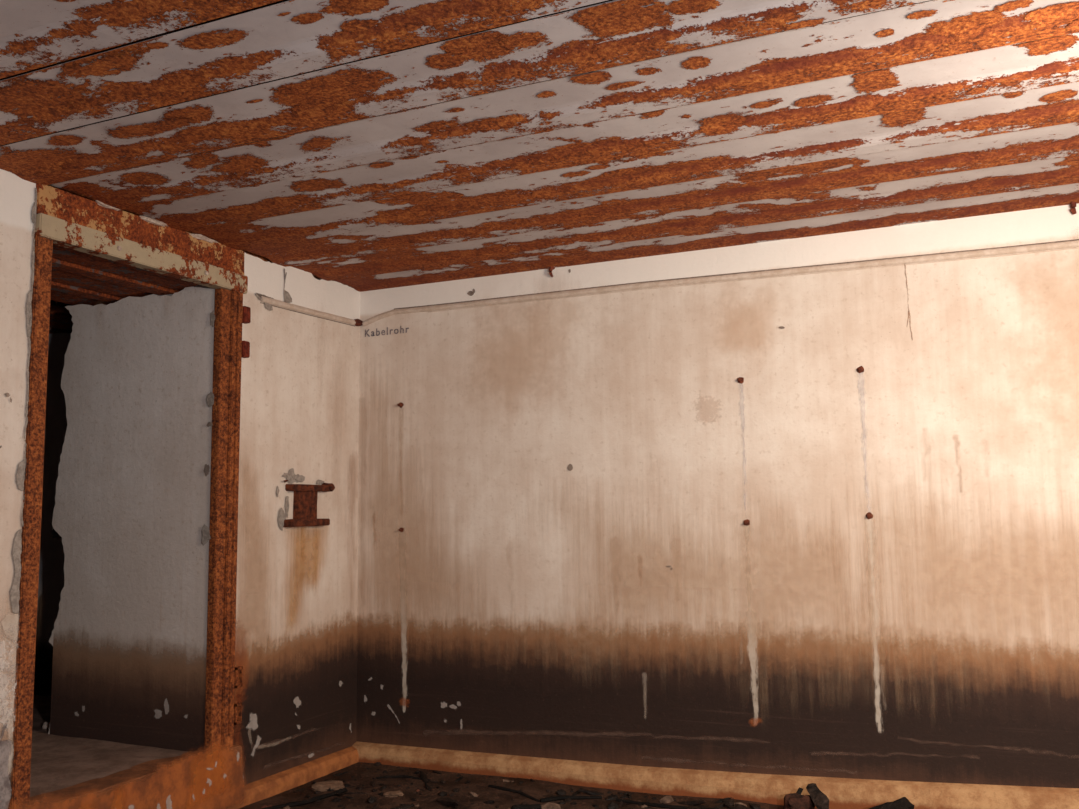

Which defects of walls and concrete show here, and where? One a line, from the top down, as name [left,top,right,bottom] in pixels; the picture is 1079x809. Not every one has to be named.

corrosion [0,0,1079,292]
peeling [190,234,218,243]
water stain [34,636,206,752]
water stain [233,518,1079,788]
peeling [0,716,13,809]
corrosion [13,744,246,809]